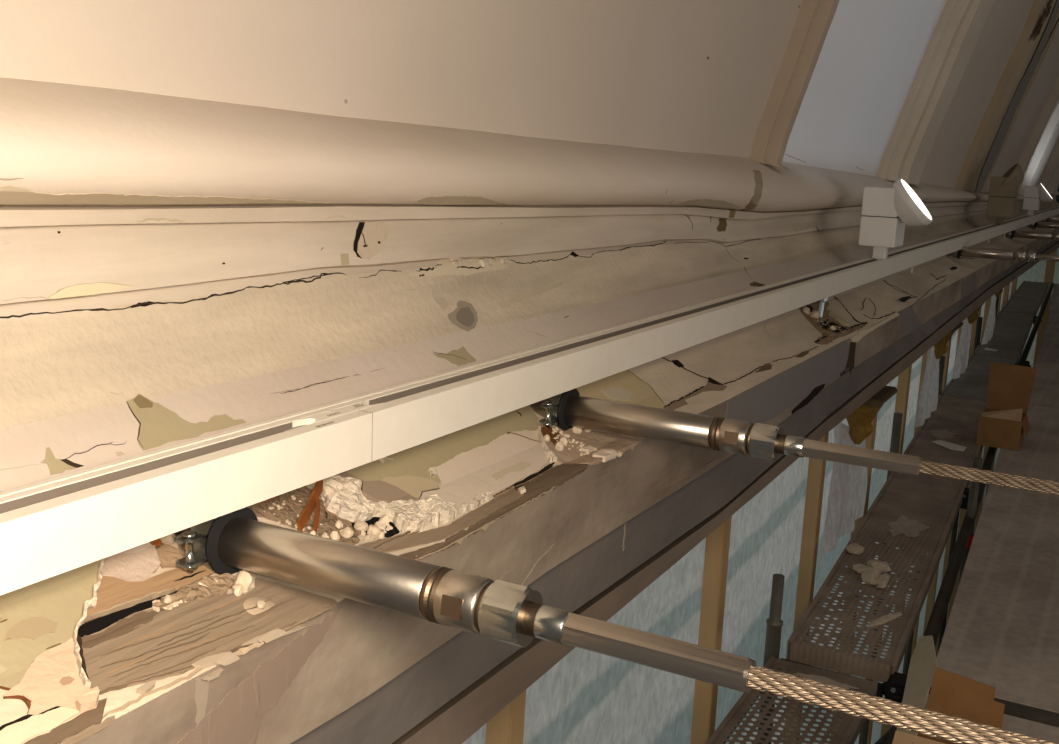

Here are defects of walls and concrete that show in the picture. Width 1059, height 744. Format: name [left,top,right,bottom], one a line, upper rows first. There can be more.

crack [0,215,764,318]
spalling [795,267,957,357]
crack [838,275,944,328]
crack [627,346,819,407]
flaking render [41,447,76,475]
flaking render [127,394,247,451]
flaking render [248,424,642,560]
flaking render [0,558,310,744]